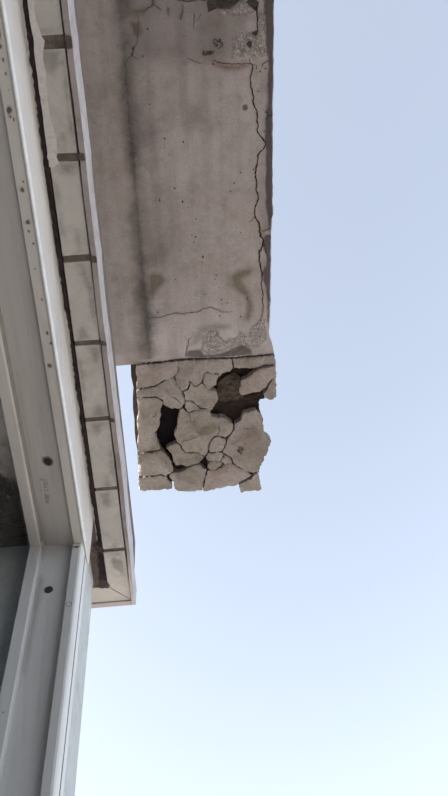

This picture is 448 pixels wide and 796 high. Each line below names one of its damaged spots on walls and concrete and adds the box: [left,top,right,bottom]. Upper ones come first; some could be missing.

peeling [202,0,267,65]
crack [188,58,270,318]
crack [146,307,229,318]
peeling [202,320,267,353]
spalling [210,367,265,424]
damp [0,478,27,547]